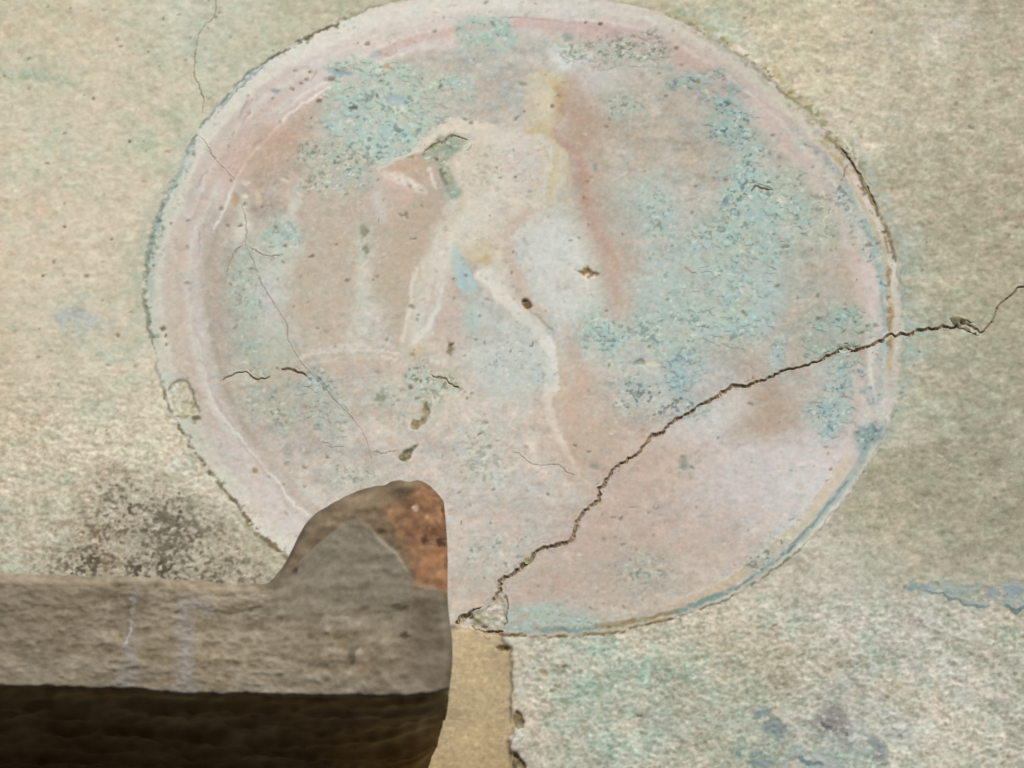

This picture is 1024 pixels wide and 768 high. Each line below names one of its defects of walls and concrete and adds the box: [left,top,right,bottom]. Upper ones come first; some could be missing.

crack [190,0,399,479]
leakage [56,504,224,583]
crack [453,283,1024,637]